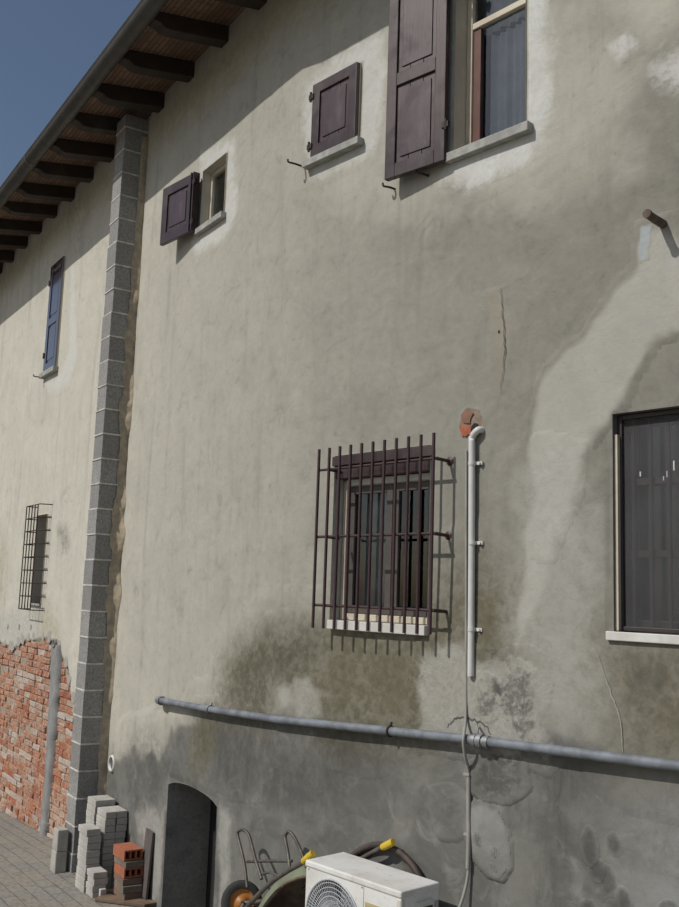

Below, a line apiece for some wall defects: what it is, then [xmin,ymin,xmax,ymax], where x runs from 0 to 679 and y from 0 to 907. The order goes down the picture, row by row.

spalling [0,597,75,839]
water stain [112,583,466,878]
water stain [432,430,679,907]